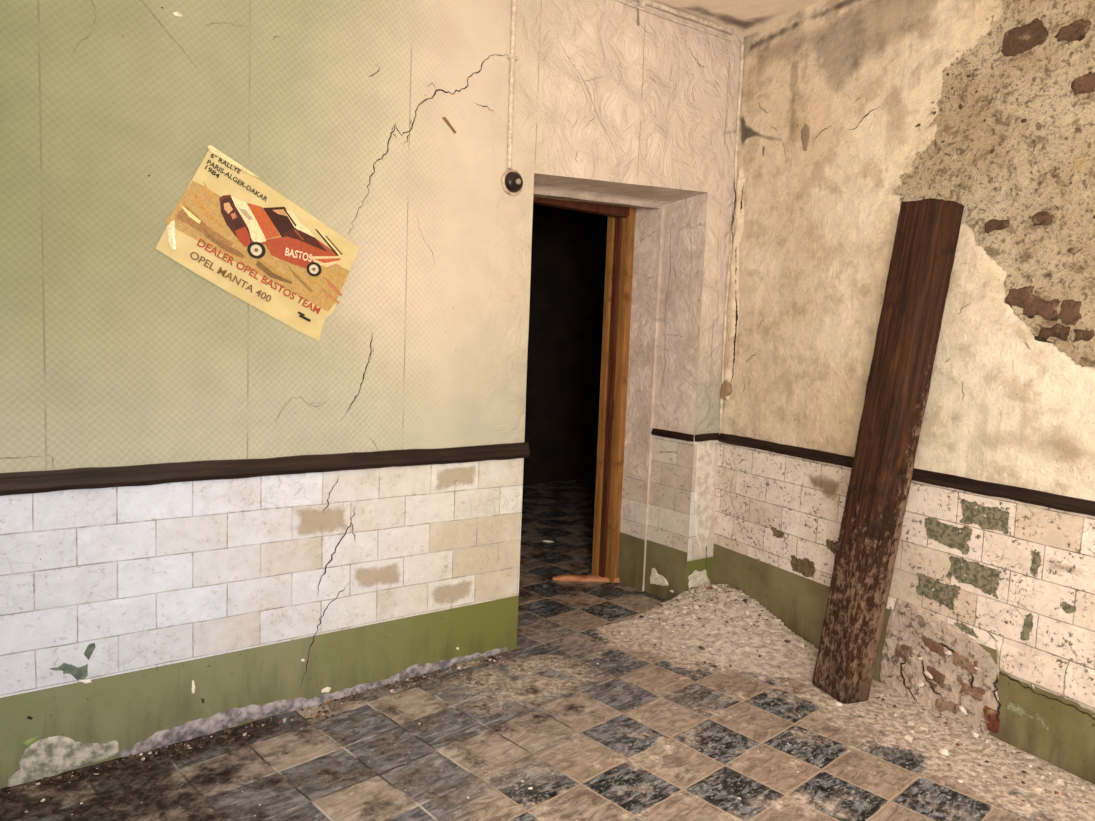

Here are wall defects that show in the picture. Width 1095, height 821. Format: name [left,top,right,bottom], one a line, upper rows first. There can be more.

crack [347,53,507,235]
spalling [892,0,1095,368]
crack [300,476,355,688]
peeling [650,568,669,586]
peeling [688,570,710,588]
spalling [880,499,1095,734]
spalling [7,643,507,787]